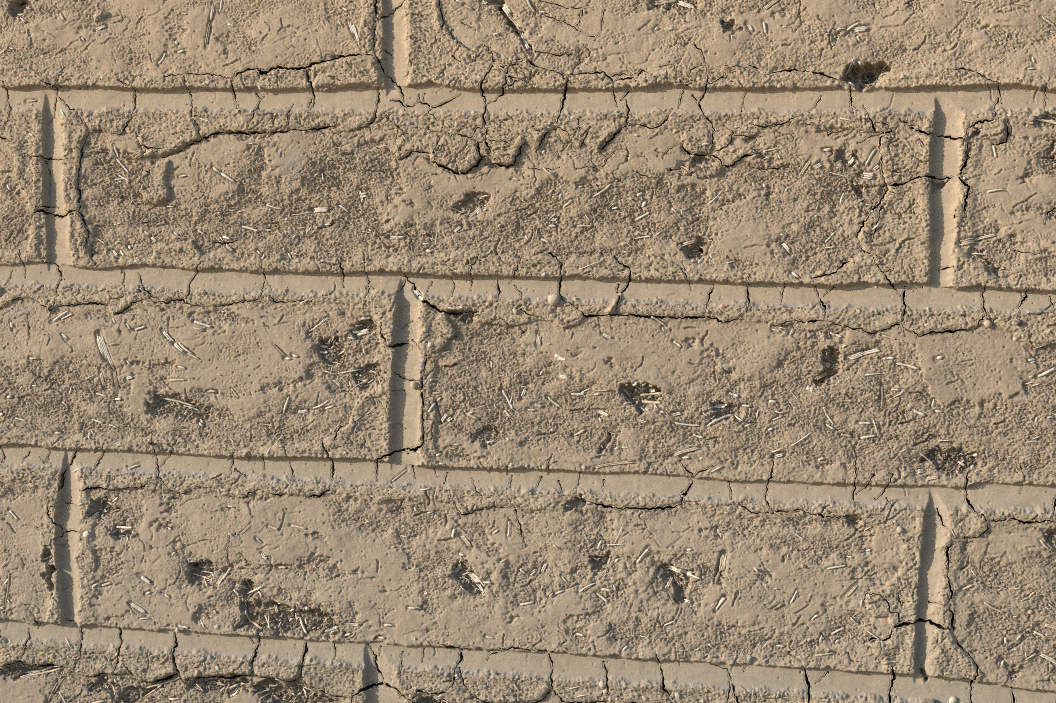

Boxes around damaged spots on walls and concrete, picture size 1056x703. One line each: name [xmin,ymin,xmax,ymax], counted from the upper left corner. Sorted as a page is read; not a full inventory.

crack [0,0,1056,345]
crack [337,250,894,545]
crack [0,426,343,541]
crack [224,535,232,564]
crack [862,467,1056,703]
crack [0,616,638,703]
crack [655,655,674,700]
crack [711,663,747,703]
crack [803,668,829,703]